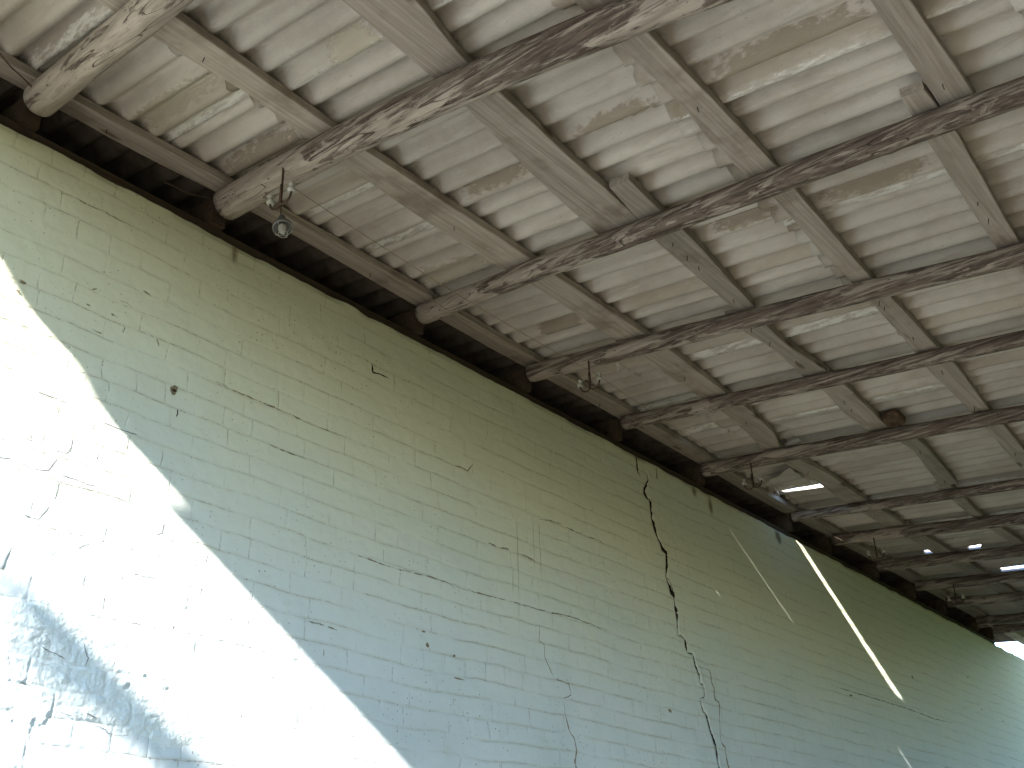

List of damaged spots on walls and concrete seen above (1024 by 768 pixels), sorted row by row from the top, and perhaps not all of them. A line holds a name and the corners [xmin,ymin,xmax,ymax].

crack [358,555,600,768]
crack [636,457,729,768]